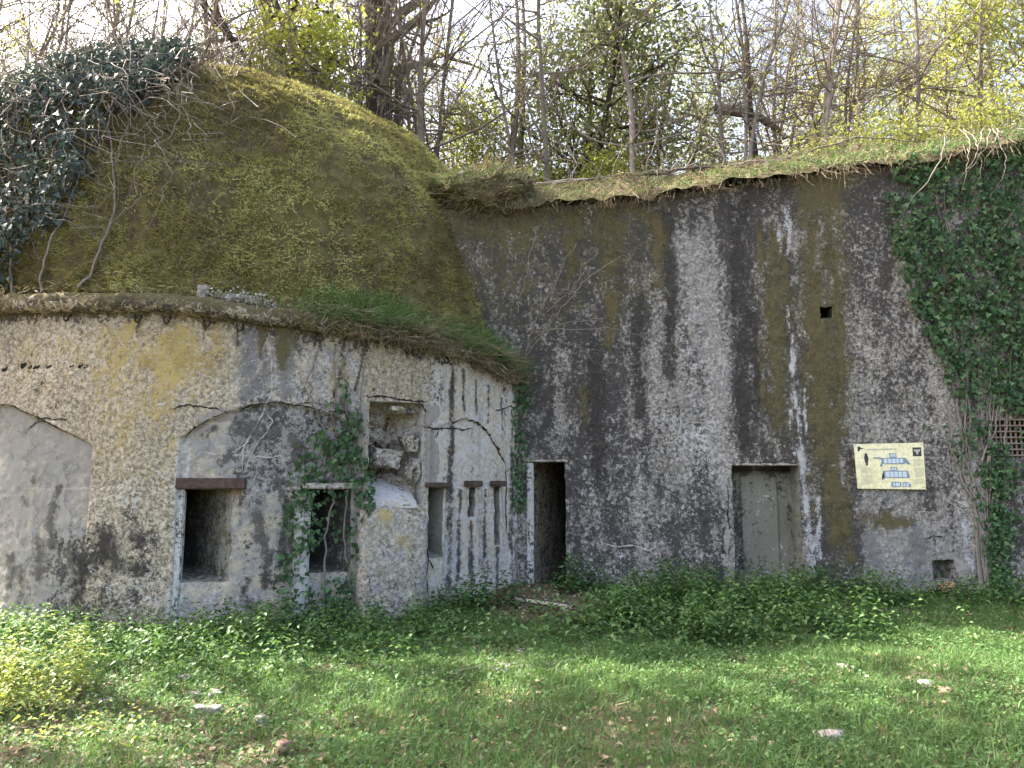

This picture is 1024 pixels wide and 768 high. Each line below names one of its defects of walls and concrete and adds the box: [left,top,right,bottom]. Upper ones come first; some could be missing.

water stain [69,524,148,606]
crack [174,340,517,529]
water stain [442,363,514,599]
water stain [578,331,615,491]
water stain [628,200,794,447]
water stain [785,309,824,572]
water stain [836,492,934,591]
water stain [959,439,992,577]